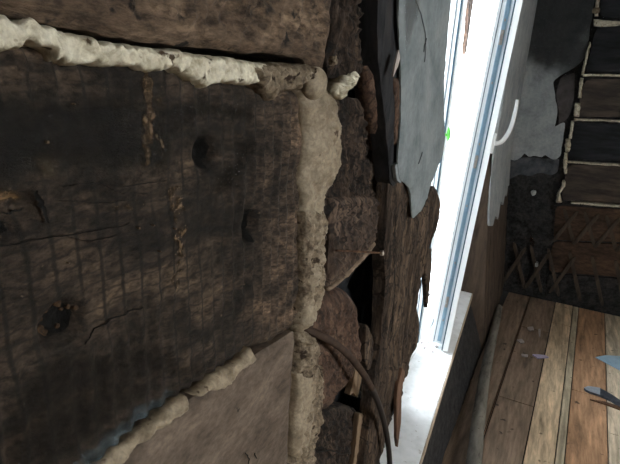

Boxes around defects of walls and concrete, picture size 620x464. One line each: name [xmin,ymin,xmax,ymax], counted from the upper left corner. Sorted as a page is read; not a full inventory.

peeling [392,0,451,218]
peeling [487,0,568,226]
crack [85,307,143,345]